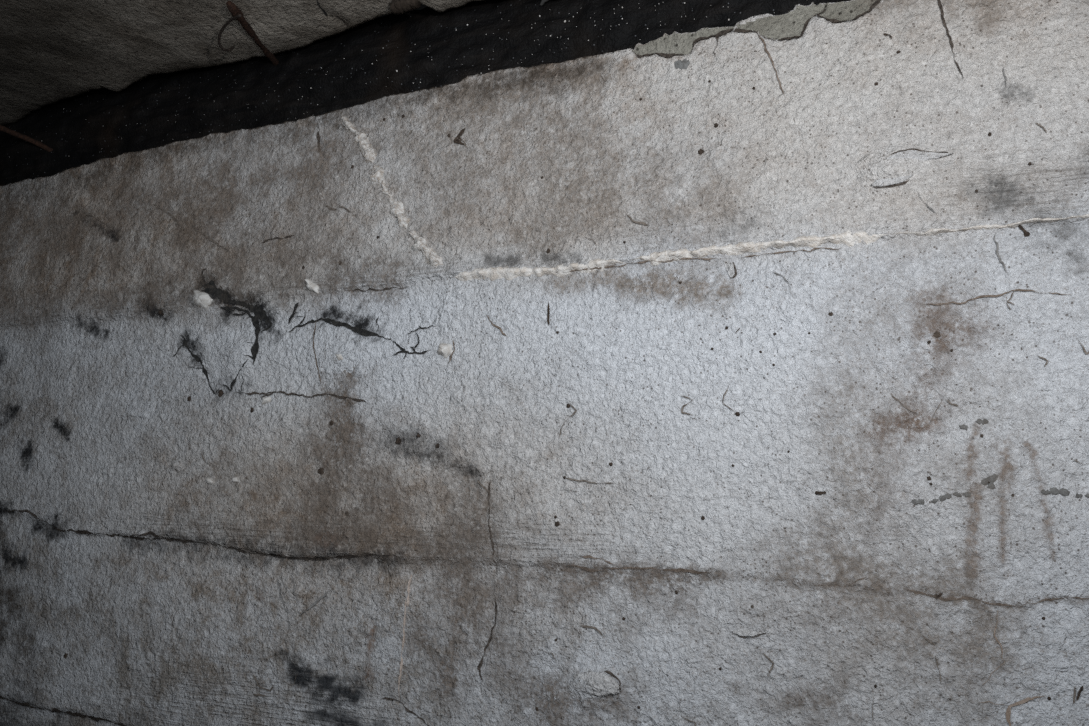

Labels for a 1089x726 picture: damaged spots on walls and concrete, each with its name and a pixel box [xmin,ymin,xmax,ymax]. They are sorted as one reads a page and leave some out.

spalling [632,0,881,69]
damp [0,113,444,274]
crack [153,204,455,404]
damp [455,214,1089,295]
crack [922,233,1071,308]
damp [21,441,32,470]
damp [53,418,70,441]
crack [7,509,407,630]
crack [477,480,497,680]
crack [563,555,707,574]
damp [290,663,365,726]
crack [904,589,1089,726]